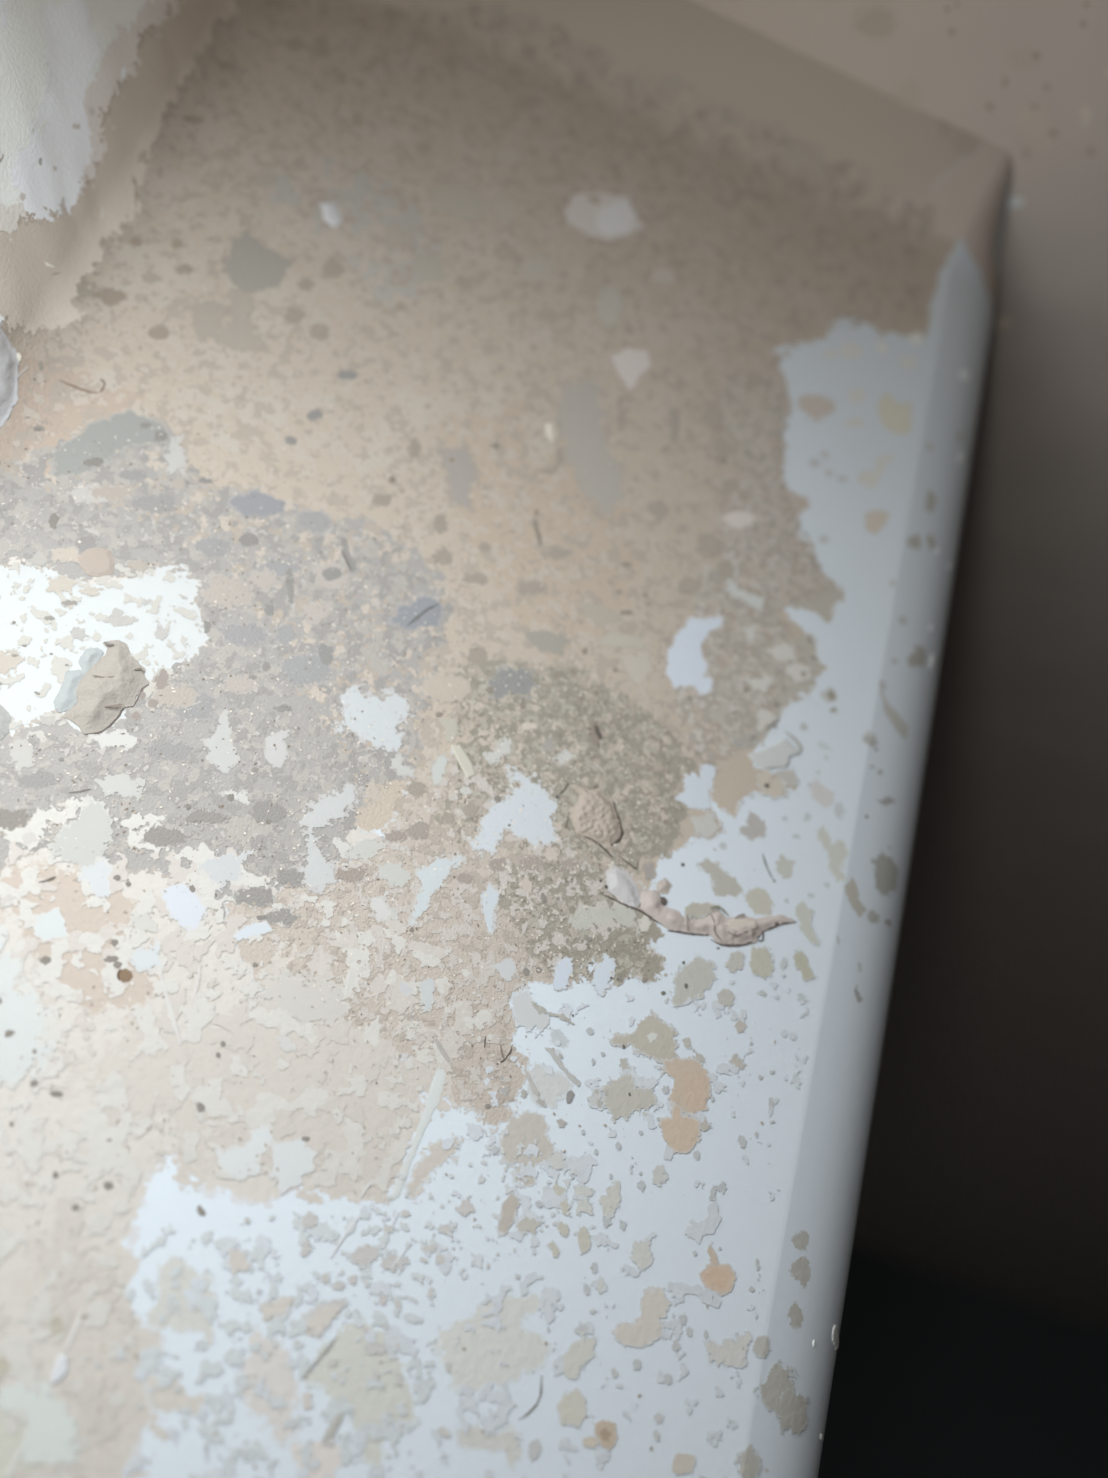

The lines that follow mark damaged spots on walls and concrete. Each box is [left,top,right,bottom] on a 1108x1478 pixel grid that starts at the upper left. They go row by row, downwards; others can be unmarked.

peeling [320,203,343,228]
spalling [48,513,60,529]
spalling [238,533,258,546]
spalling [78,547,115,577]
spalling [322,537,356,581]
spalling [264,567,295,616]
spalling [319,643,333,666]
peeling [425,675,494,779]
spalling [103,939,133,982]
spalling [30,1080,63,1097]